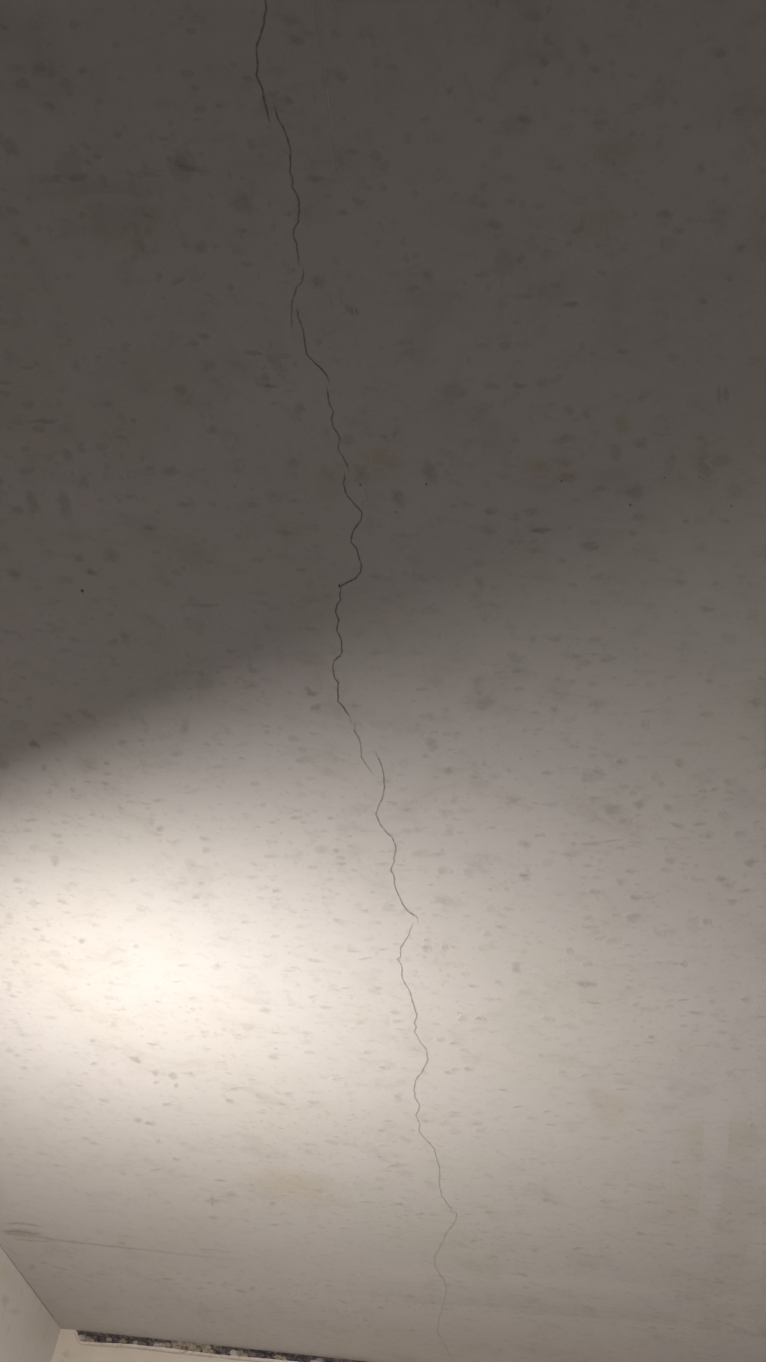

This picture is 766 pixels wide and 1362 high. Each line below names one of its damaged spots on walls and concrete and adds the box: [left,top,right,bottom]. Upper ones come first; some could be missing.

crack [255,0,458,1362]
crack [0,1244,57,1322]
crack [81,1344,265,1362]